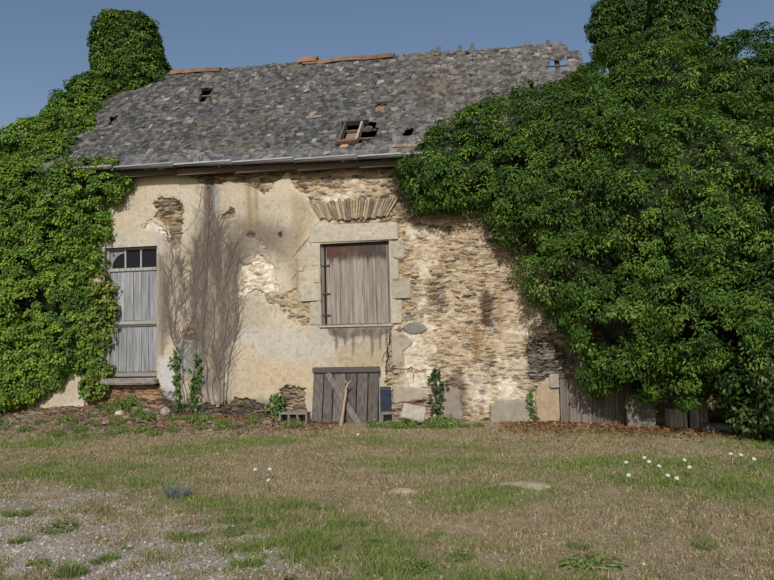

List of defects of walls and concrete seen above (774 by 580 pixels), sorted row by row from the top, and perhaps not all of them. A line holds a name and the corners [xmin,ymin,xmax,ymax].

flaking render [145,197,186,250]
flaking render [236,232,316,327]